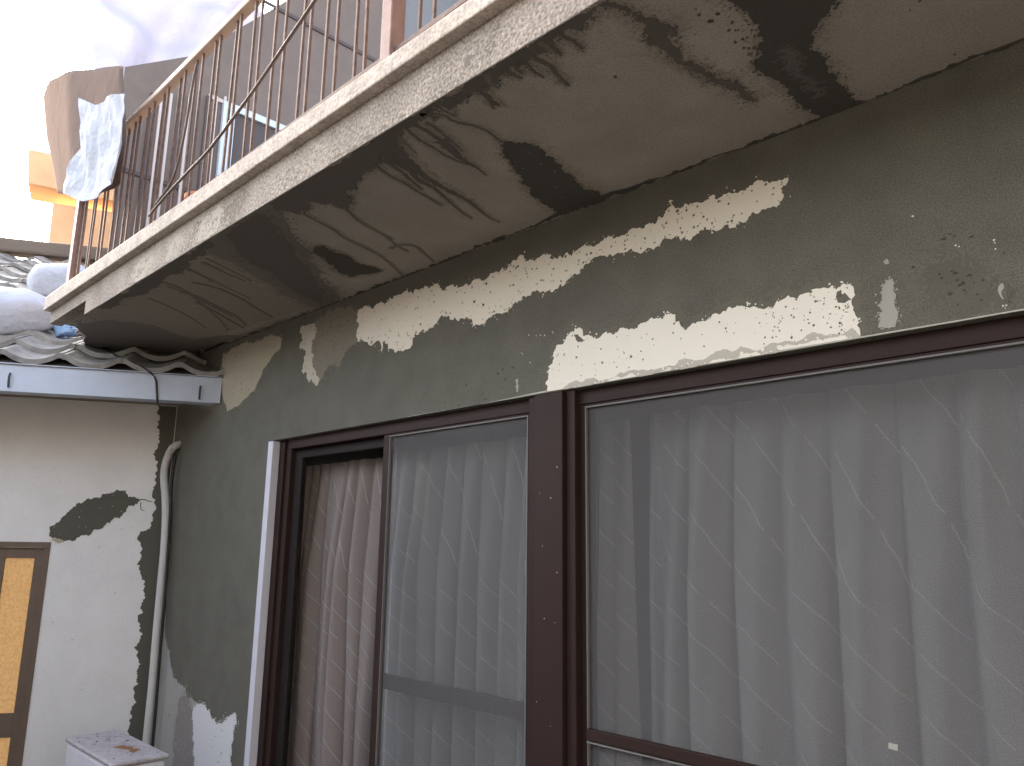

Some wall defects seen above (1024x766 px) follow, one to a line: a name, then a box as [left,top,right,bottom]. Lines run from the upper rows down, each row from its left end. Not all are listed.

damp [66,0,820,386]
peeling [356,176,789,353]
flaking render [221,332,282,411]
peeling [299,323,320,386]
peeling [154,638,239,766]